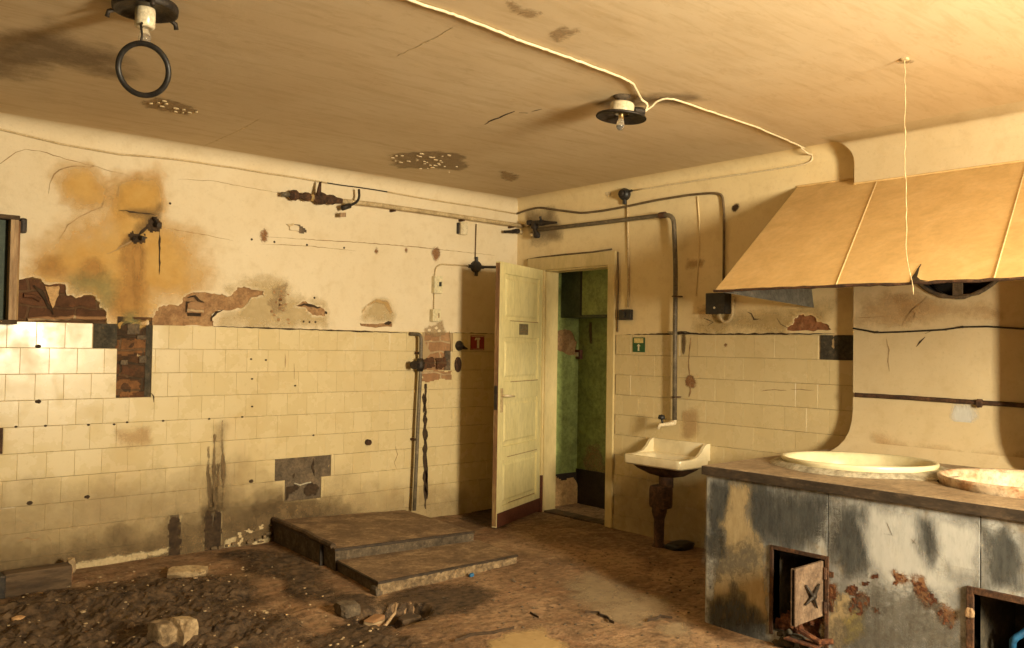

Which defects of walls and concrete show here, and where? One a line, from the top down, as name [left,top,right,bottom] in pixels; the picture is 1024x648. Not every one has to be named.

water stain [34,168,203,329]
spalling [17,277,327,402]
flaking render [422,322,452,382]
rust [682,334,696,397]
peeling [787,314,853,360]
water stain [206,434,226,511]
peeling [275,455,331,502]
water stain [713,483,768,624]
water stain [866,507,977,589]
water stain [822,594,863,648]
rust [829,574,881,616]
rust [892,569,956,630]